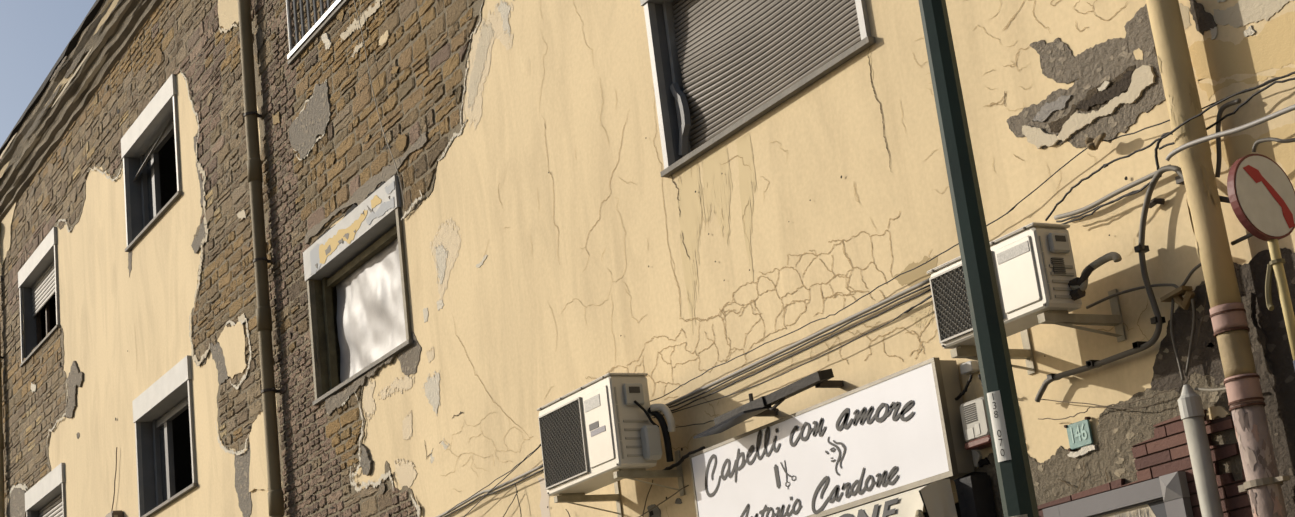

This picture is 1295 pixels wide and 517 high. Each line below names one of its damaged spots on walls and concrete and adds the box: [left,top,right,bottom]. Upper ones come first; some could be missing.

crack [972,0,1128,111]
spalling [1006,4,1166,149]
spalling [1189,0,1295,35]
spalling [0,0,484,517]
crack [483,0,937,450]
spalling [971,450,1004,517]
spalling [1028,280,1243,506]
spalling [1233,247,1295,517]